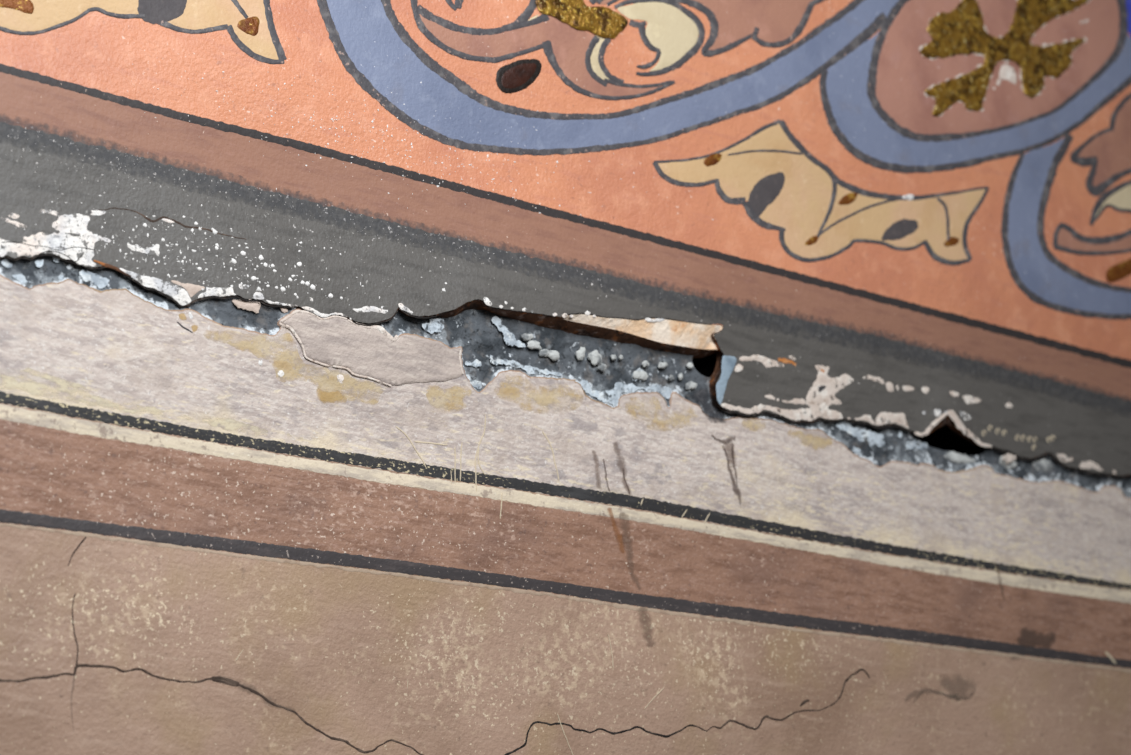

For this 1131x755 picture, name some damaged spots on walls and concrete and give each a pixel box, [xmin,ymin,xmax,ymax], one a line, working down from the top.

peeling [291,104,515,195]
spalling [0,127,1131,498]
damp [712,435,740,499]
crack [0,593,423,755]
crack [504,669,870,755]